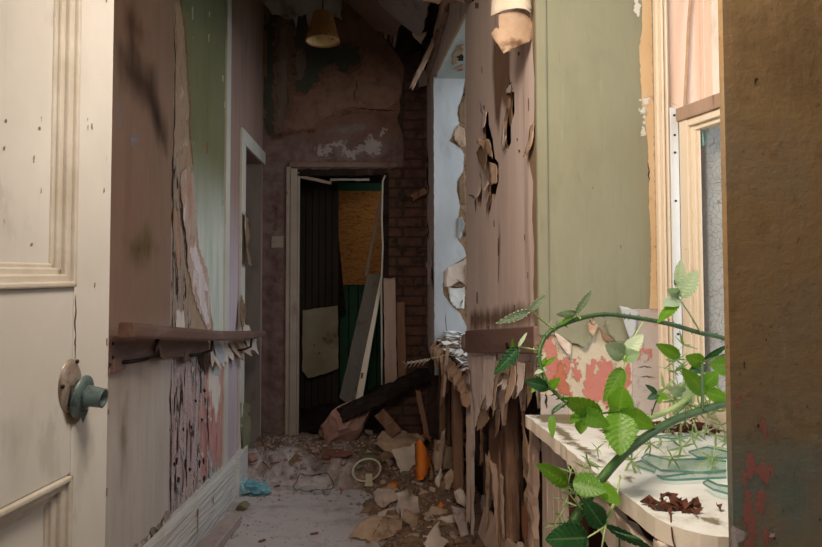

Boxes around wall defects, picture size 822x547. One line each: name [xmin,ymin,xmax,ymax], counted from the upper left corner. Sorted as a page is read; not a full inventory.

spalling [378,28,431,71]
spalling [170,0,213,330]
peeling [315,127,388,160]
peeling [518,0,537,326]
peeling [638,97,650,136]
peeling [731,451,783,547]